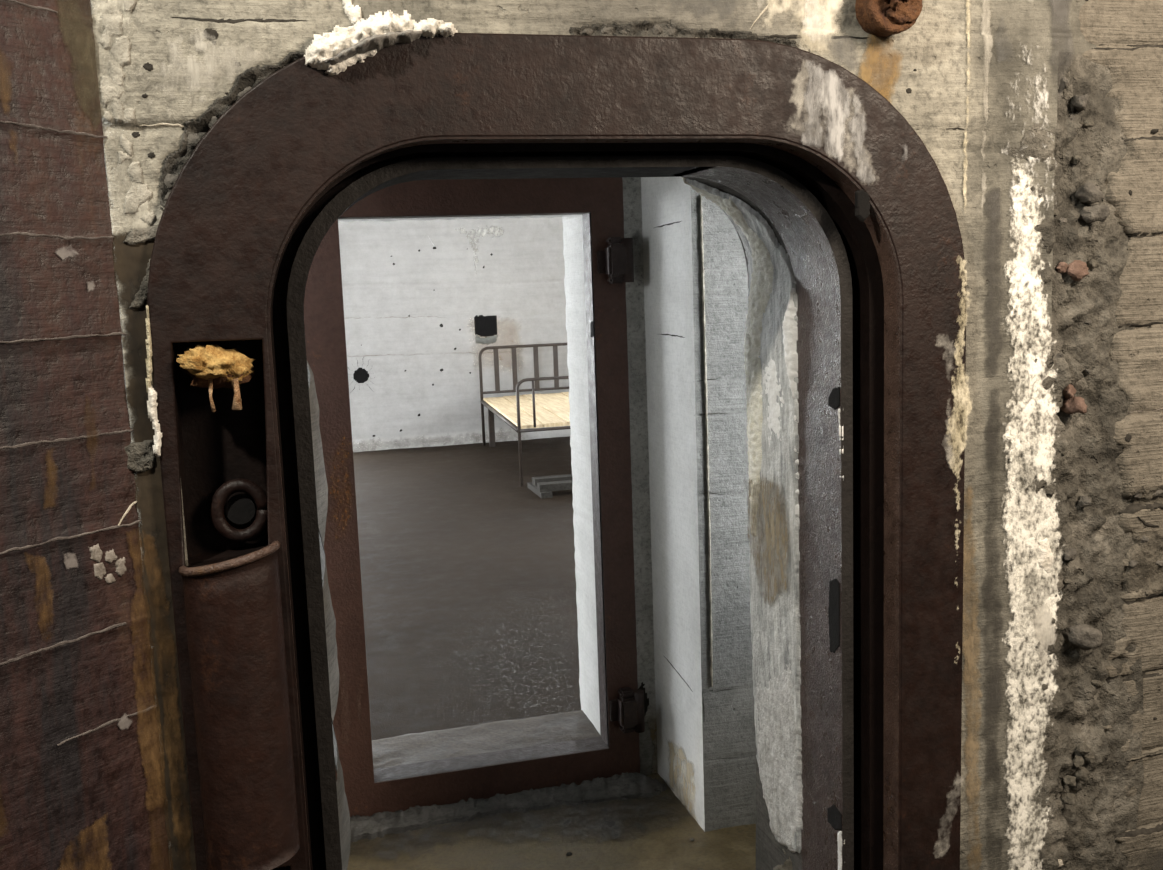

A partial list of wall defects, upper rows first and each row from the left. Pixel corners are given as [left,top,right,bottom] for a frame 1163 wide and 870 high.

peeling [95,0,306,245]
water stain [304,0,458,75]
rust [860,34,901,100]
rust [884,0,919,24]
water stain [682,177,803,854]
water stain [947,258,972,510]
water stain [984,146,1062,870]
spalling [1006,51,1163,870]